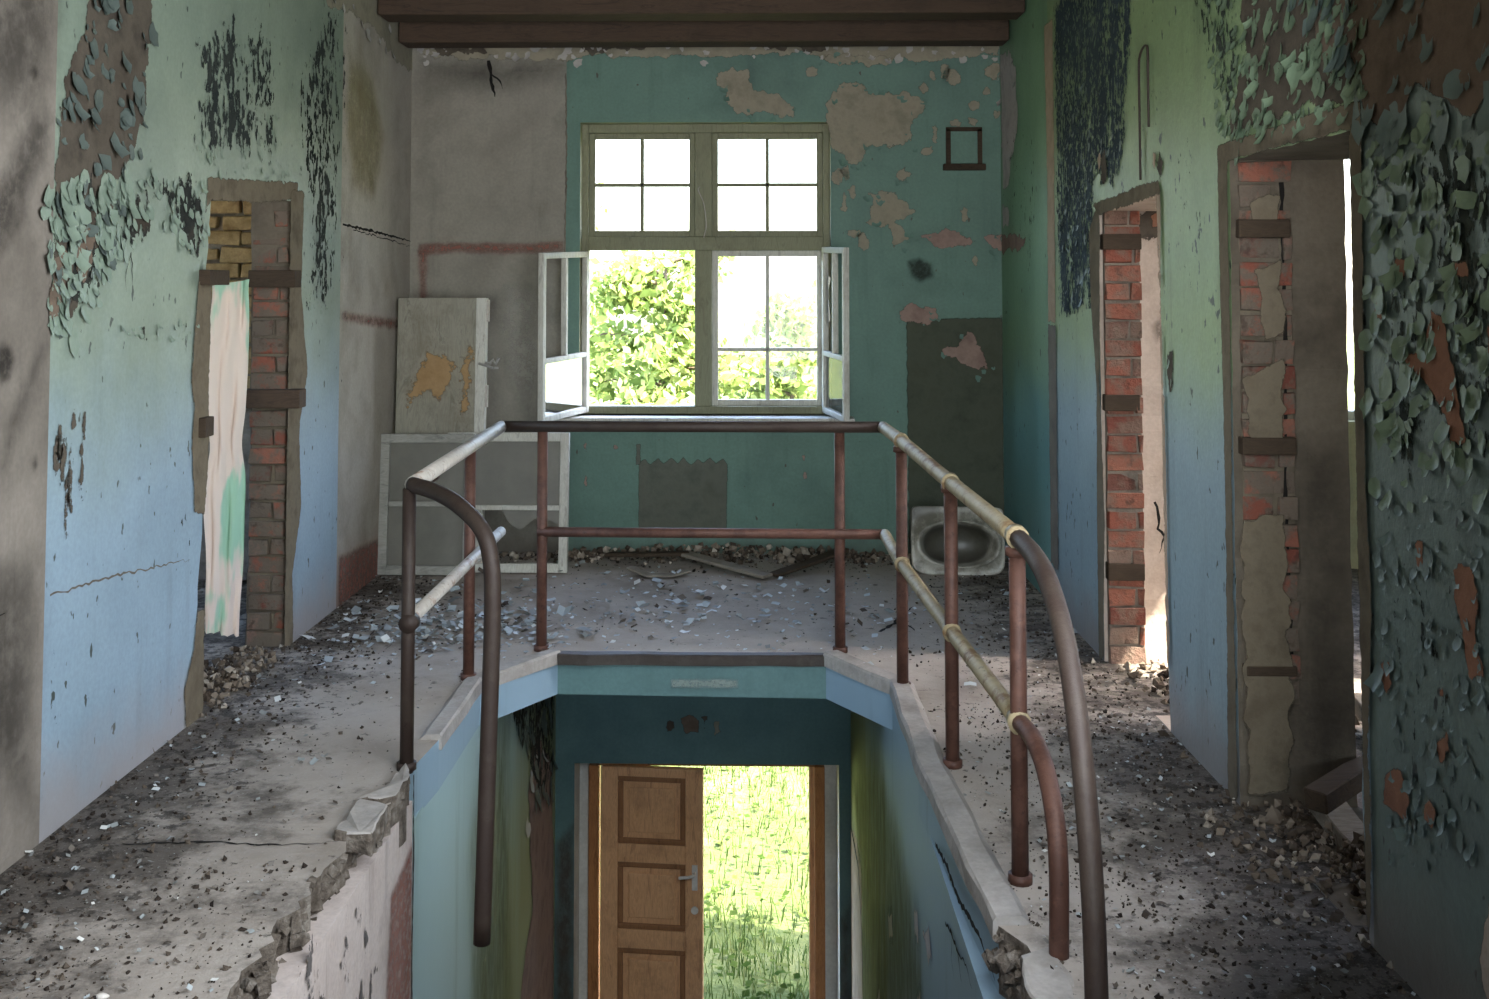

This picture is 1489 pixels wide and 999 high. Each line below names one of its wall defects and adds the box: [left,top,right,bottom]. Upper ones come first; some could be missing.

damp [0,349,12,378]
peeling [40,0,1201,666]
peeling [1195,0,1489,932]
crack [50,559,187,596]
flaking render [184,609,205,728]
spalling [230,836,384,999]
crack [935,842,995,985]
flaking render [1479,907,1489,999]